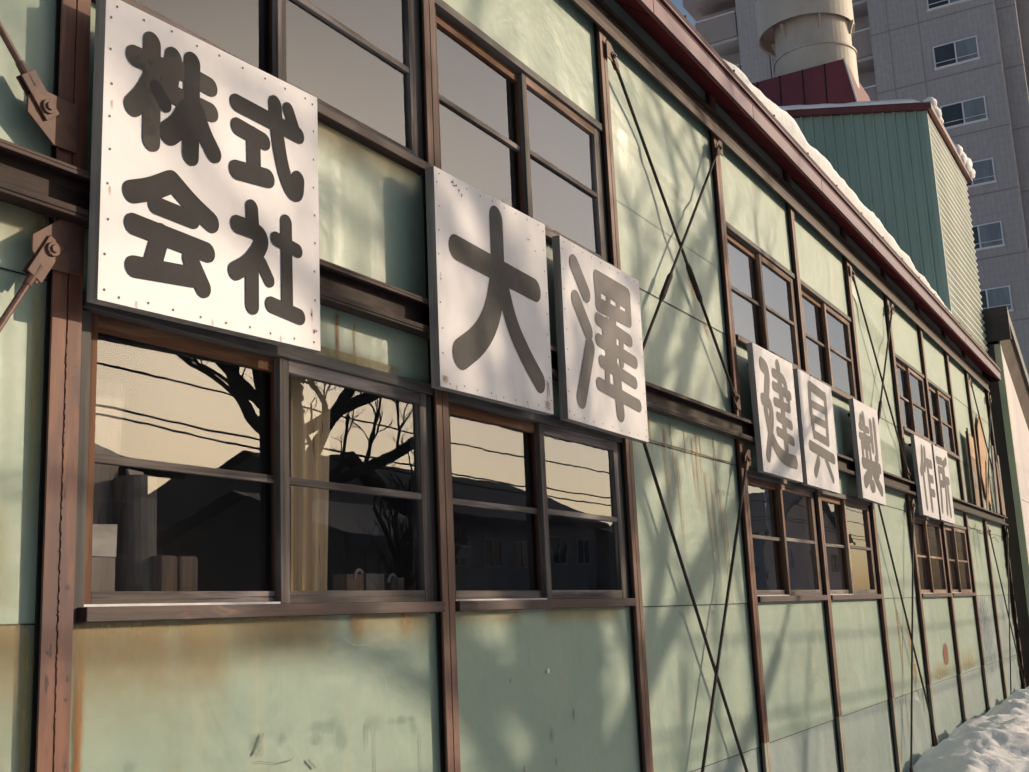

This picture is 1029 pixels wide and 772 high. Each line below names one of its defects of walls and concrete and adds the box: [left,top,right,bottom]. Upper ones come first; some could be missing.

corrosion [74,629,84,772]